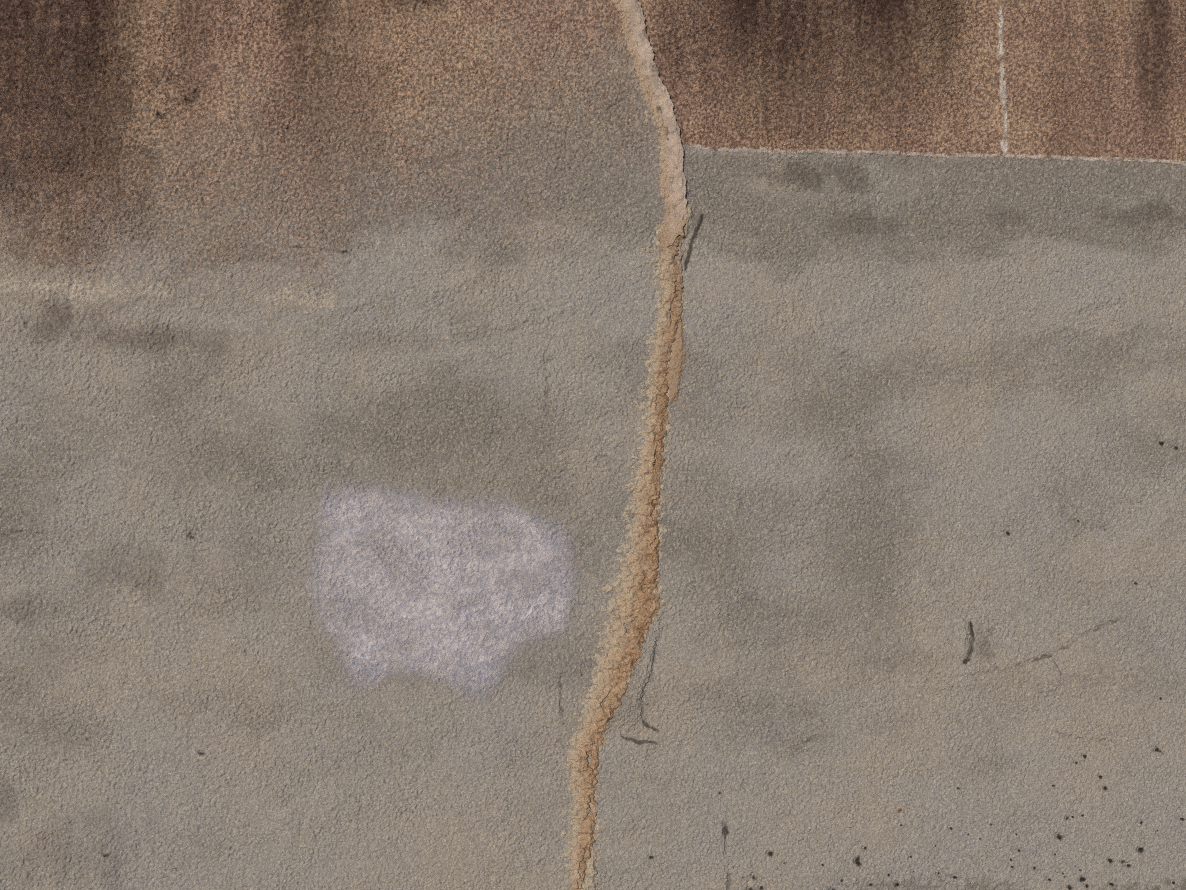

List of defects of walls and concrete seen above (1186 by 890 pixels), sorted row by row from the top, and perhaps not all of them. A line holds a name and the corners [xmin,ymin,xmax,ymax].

water stain [0,0,47,73]
water stain [62,0,113,95]
water stain [728,0,816,79]
water stain [847,0,919,63]
crack [557,0,688,890]